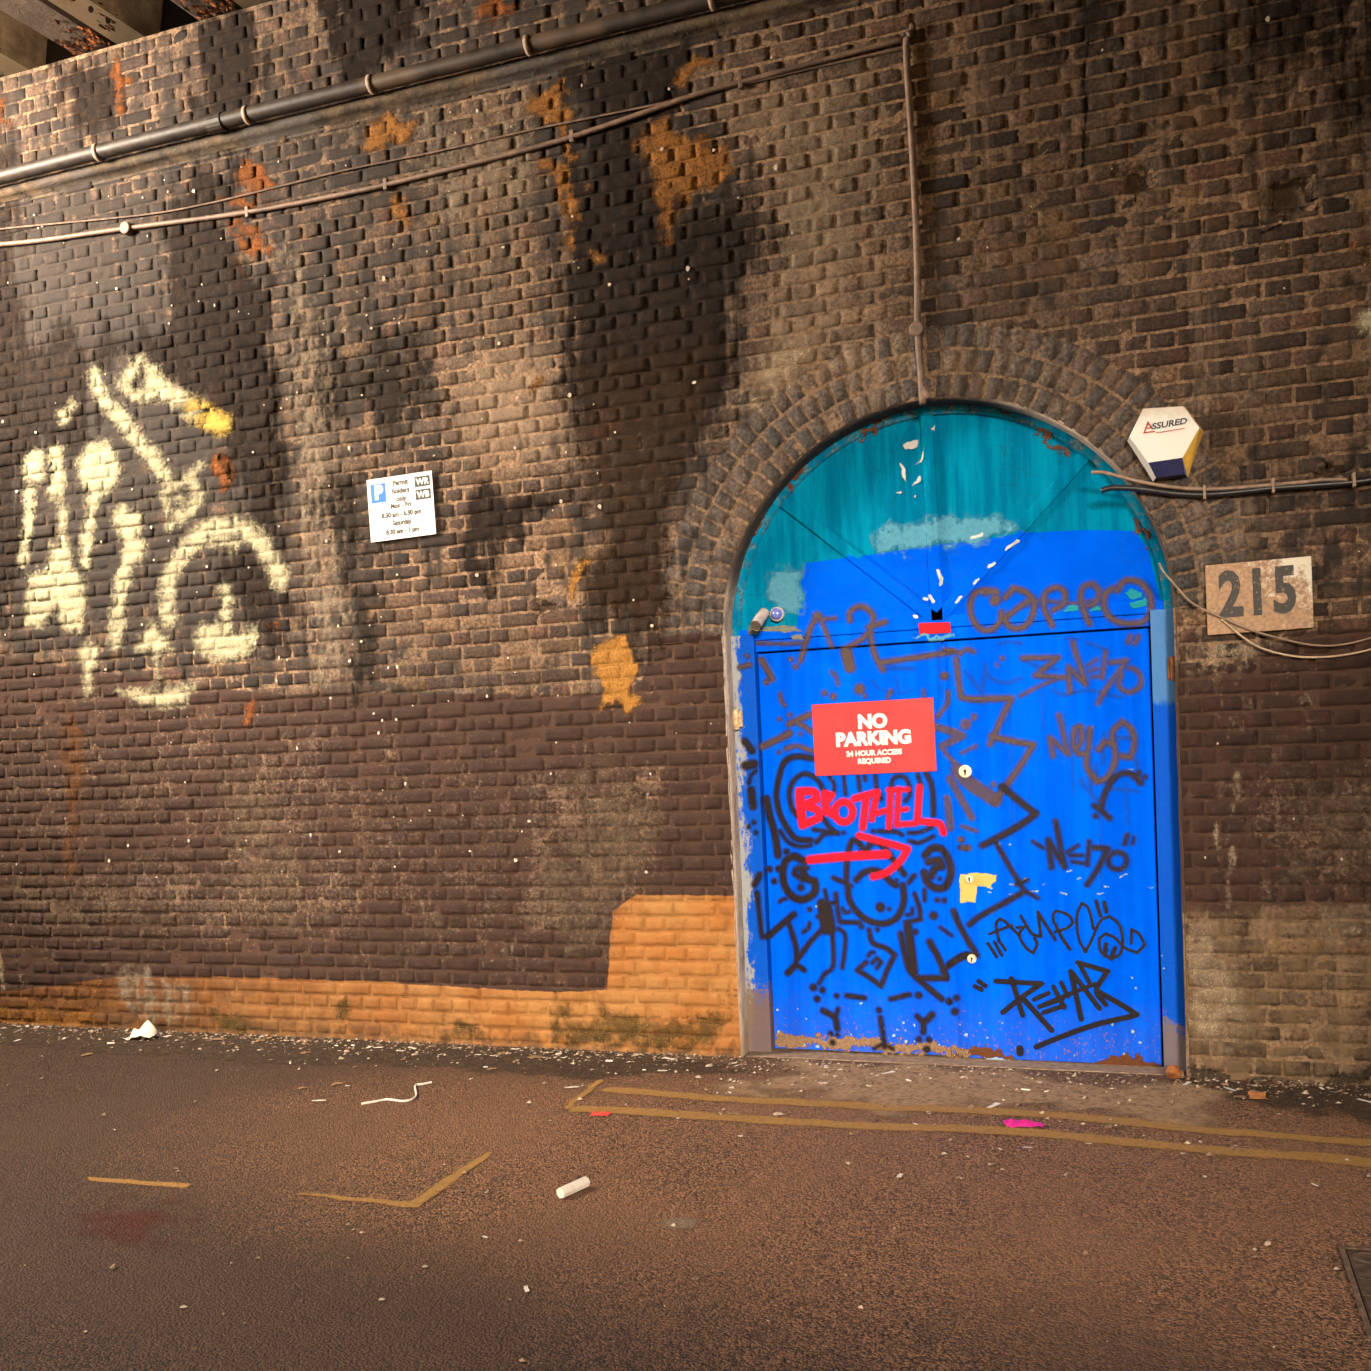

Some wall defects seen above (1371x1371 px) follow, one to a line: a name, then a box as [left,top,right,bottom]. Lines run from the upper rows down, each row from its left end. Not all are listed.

corrosion [360,110,419,161]
leakage [296,309,441,435]
leakage [559,38,810,659]
leakage [464,479,556,598]
leakage [1185,925,1253,1050]